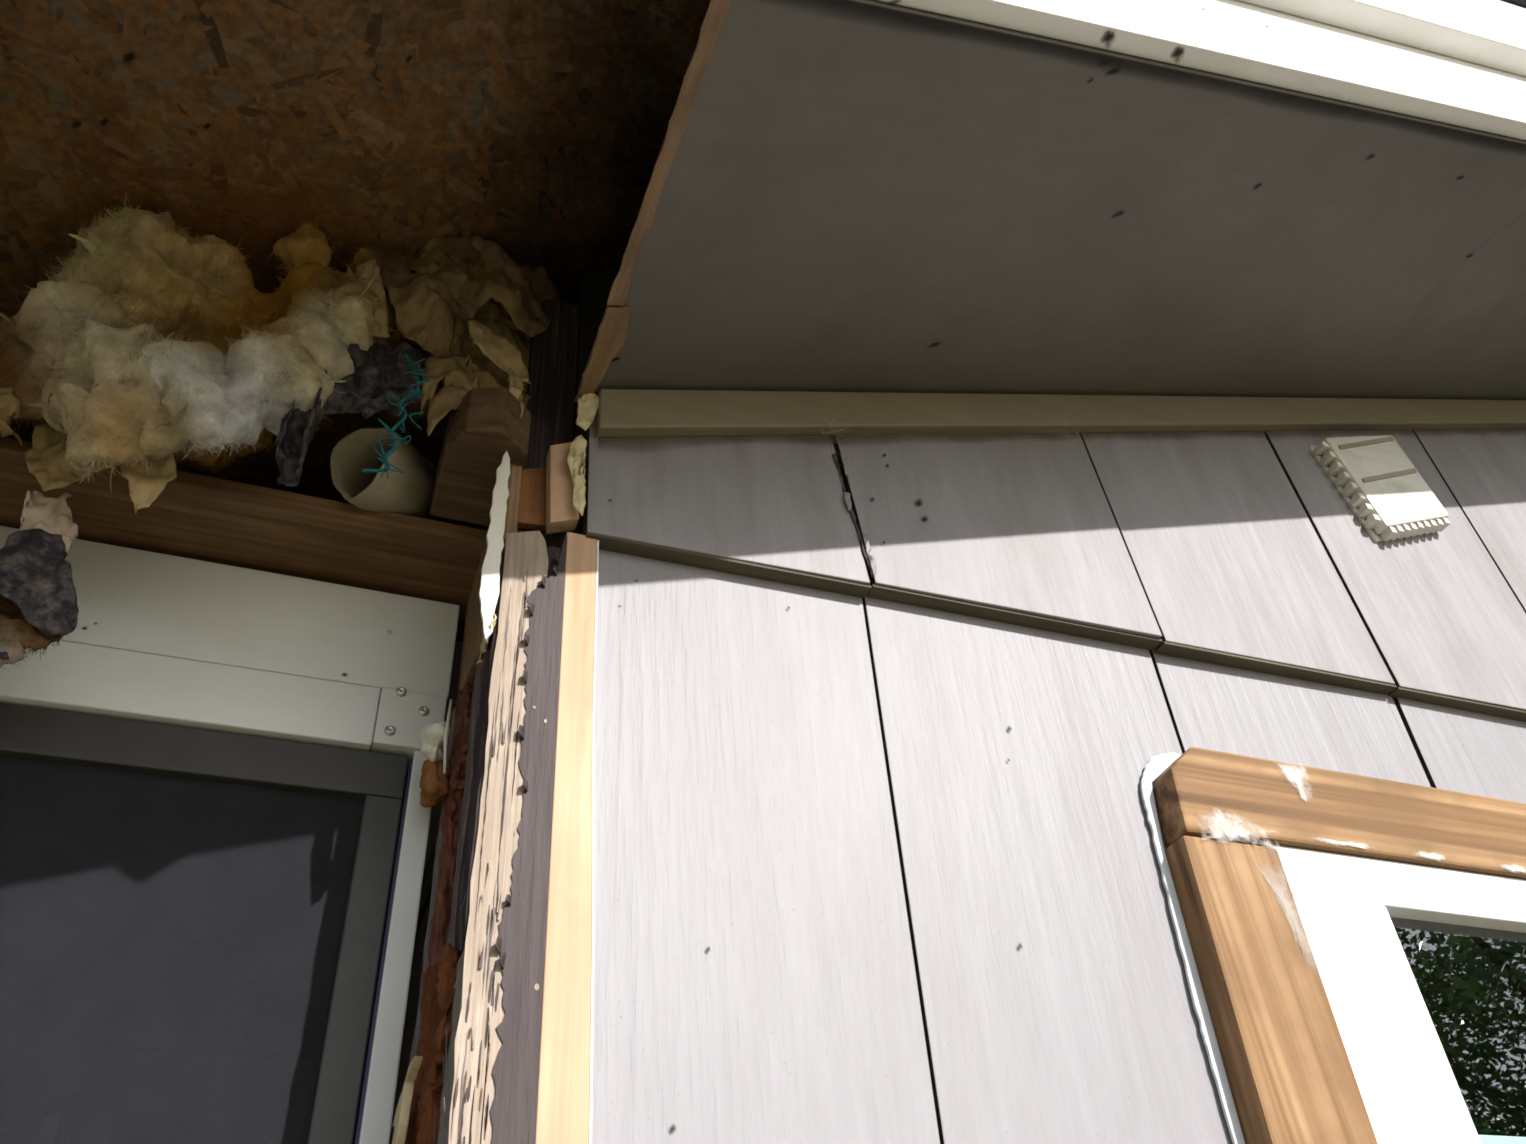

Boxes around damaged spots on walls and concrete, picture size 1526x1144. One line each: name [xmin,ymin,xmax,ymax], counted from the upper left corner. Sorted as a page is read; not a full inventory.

peeling [476,451,510,665]
crack [832,453,877,577]
damp [428,684,474,966]
peeling [455,536,567,1144]